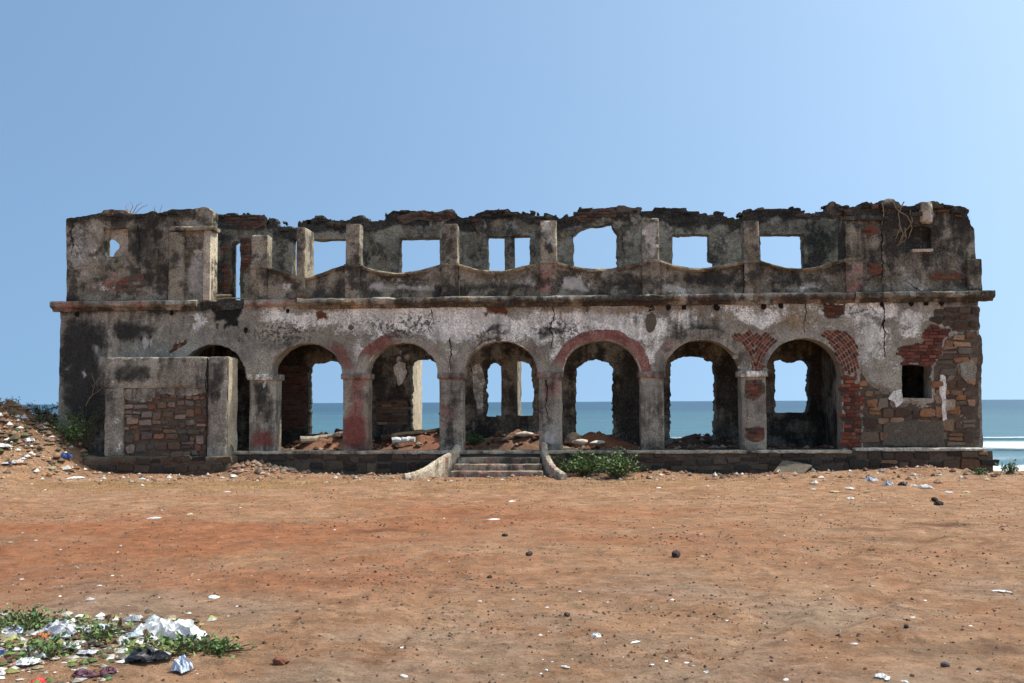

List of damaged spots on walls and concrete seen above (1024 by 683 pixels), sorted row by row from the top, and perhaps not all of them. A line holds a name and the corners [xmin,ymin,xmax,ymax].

efflorescence [369,283,434,291]
water stain [562,274,633,292]
crack [868,229,919,357]
water stain [64,321,155,418]
spalling [536,303,1000,474]